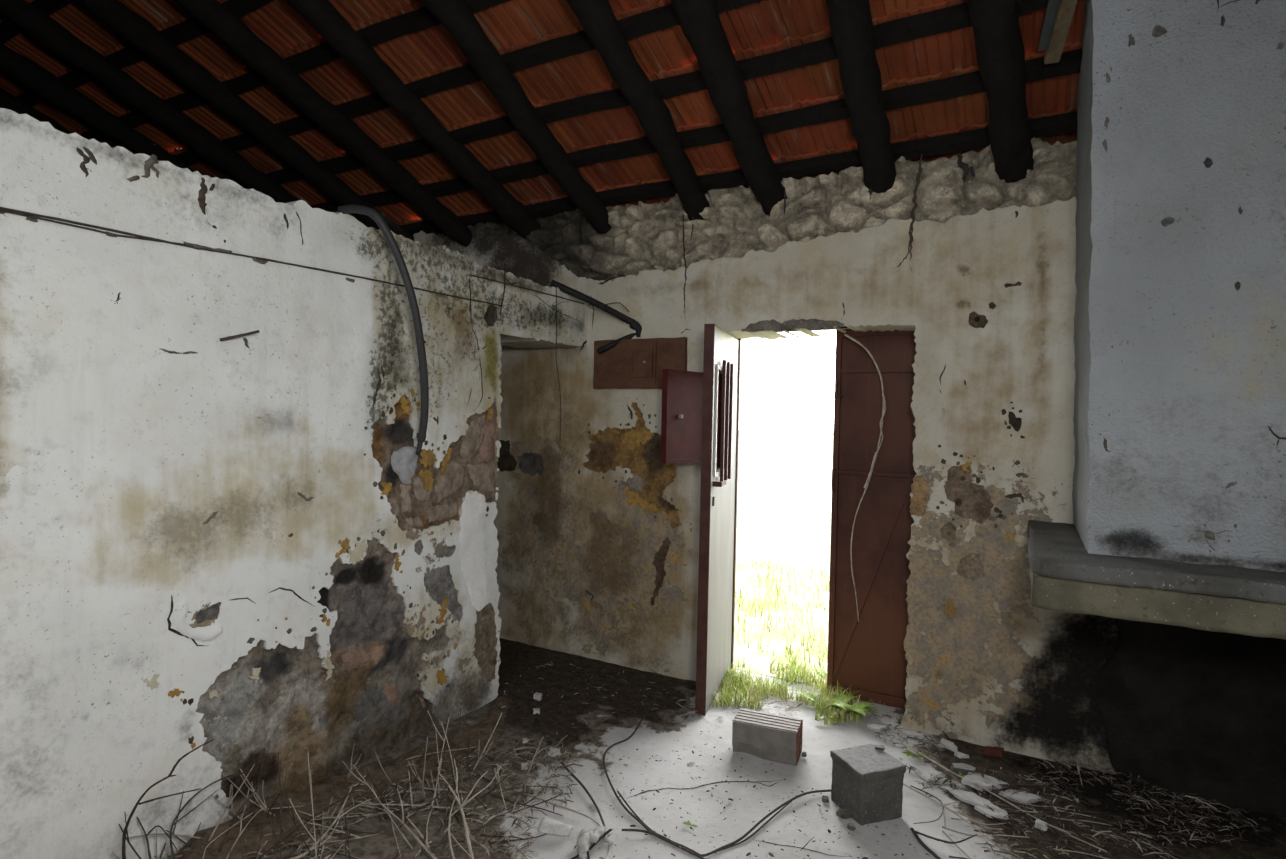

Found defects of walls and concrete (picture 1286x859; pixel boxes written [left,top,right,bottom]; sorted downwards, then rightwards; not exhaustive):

flaking render [484,137,1077,281]
leakage [369,361,389,415]
flaking render [578,398,692,606]
flaking render [910,445,1013,580]
flaking render [143,388,544,818]